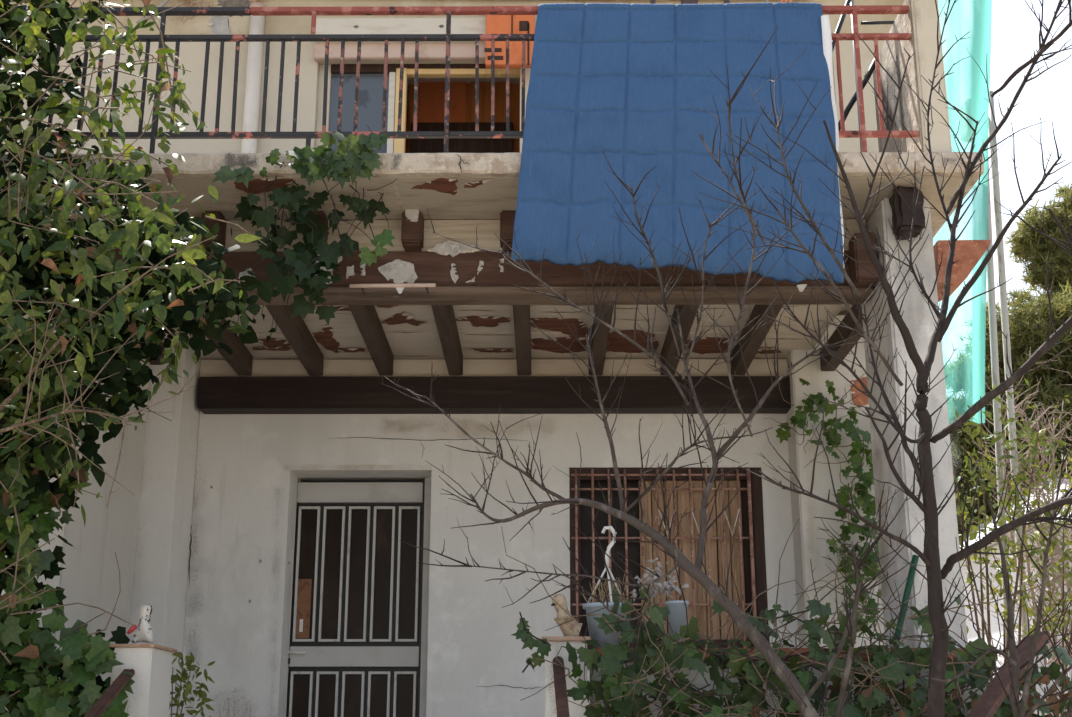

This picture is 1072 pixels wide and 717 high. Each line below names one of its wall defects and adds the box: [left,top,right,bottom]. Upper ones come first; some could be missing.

peeling [407,178,492,195]
peeling [427,240,485,284]
peeling [314,254,428,326]
peeling [249,338,293,352]
peeling [312,324,368,353]
peeling [455,316,514,328]
peeling [530,318,590,354]
peeling [607,330,660,353]